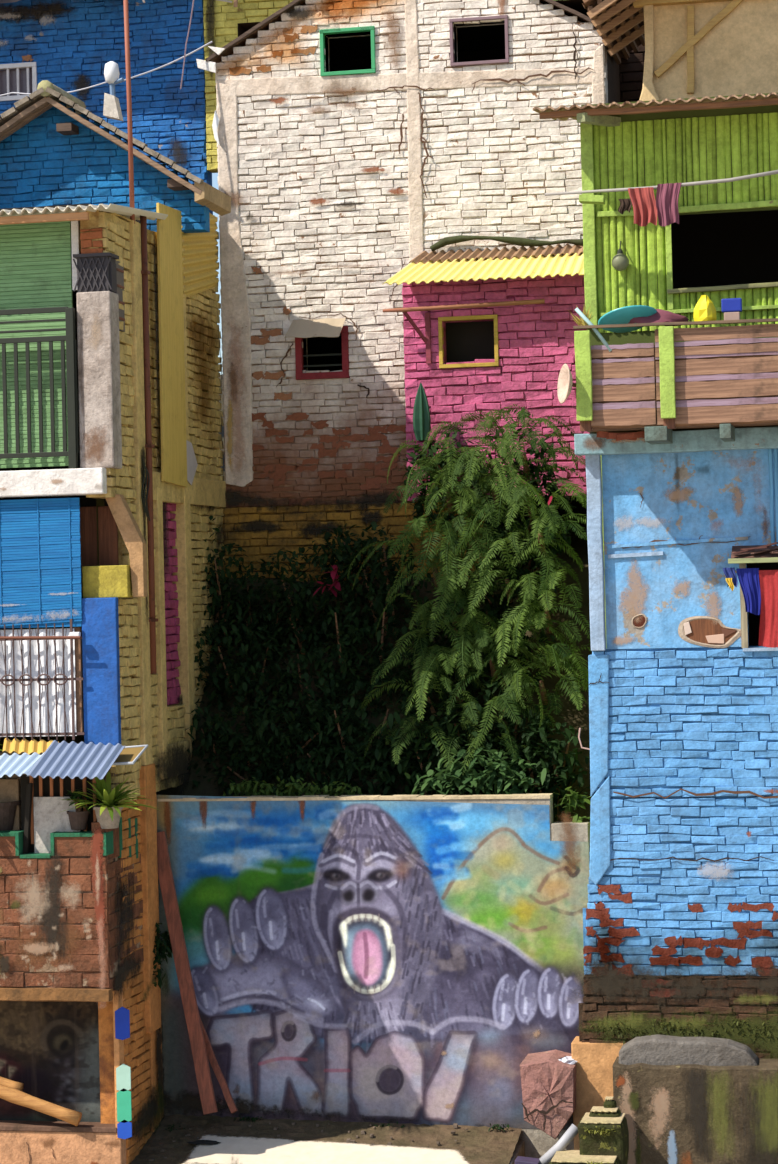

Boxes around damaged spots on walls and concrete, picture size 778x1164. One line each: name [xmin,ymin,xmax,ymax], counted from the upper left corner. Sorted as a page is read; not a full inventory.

crack [472,32,593,93]
crack [375,85,435,198]
flaking render [251,328,282,345]
crack [276,313,358,387]
flaking render [252,370,292,401]
flaking render [252,412,406,497]
peeling [734,489,743,514]
peeling [613,566,647,645]
peeling [674,582,690,595]
spalling [678,592,741,648]
crack [613,789,778,799]
flaking render [583,884,778,997]